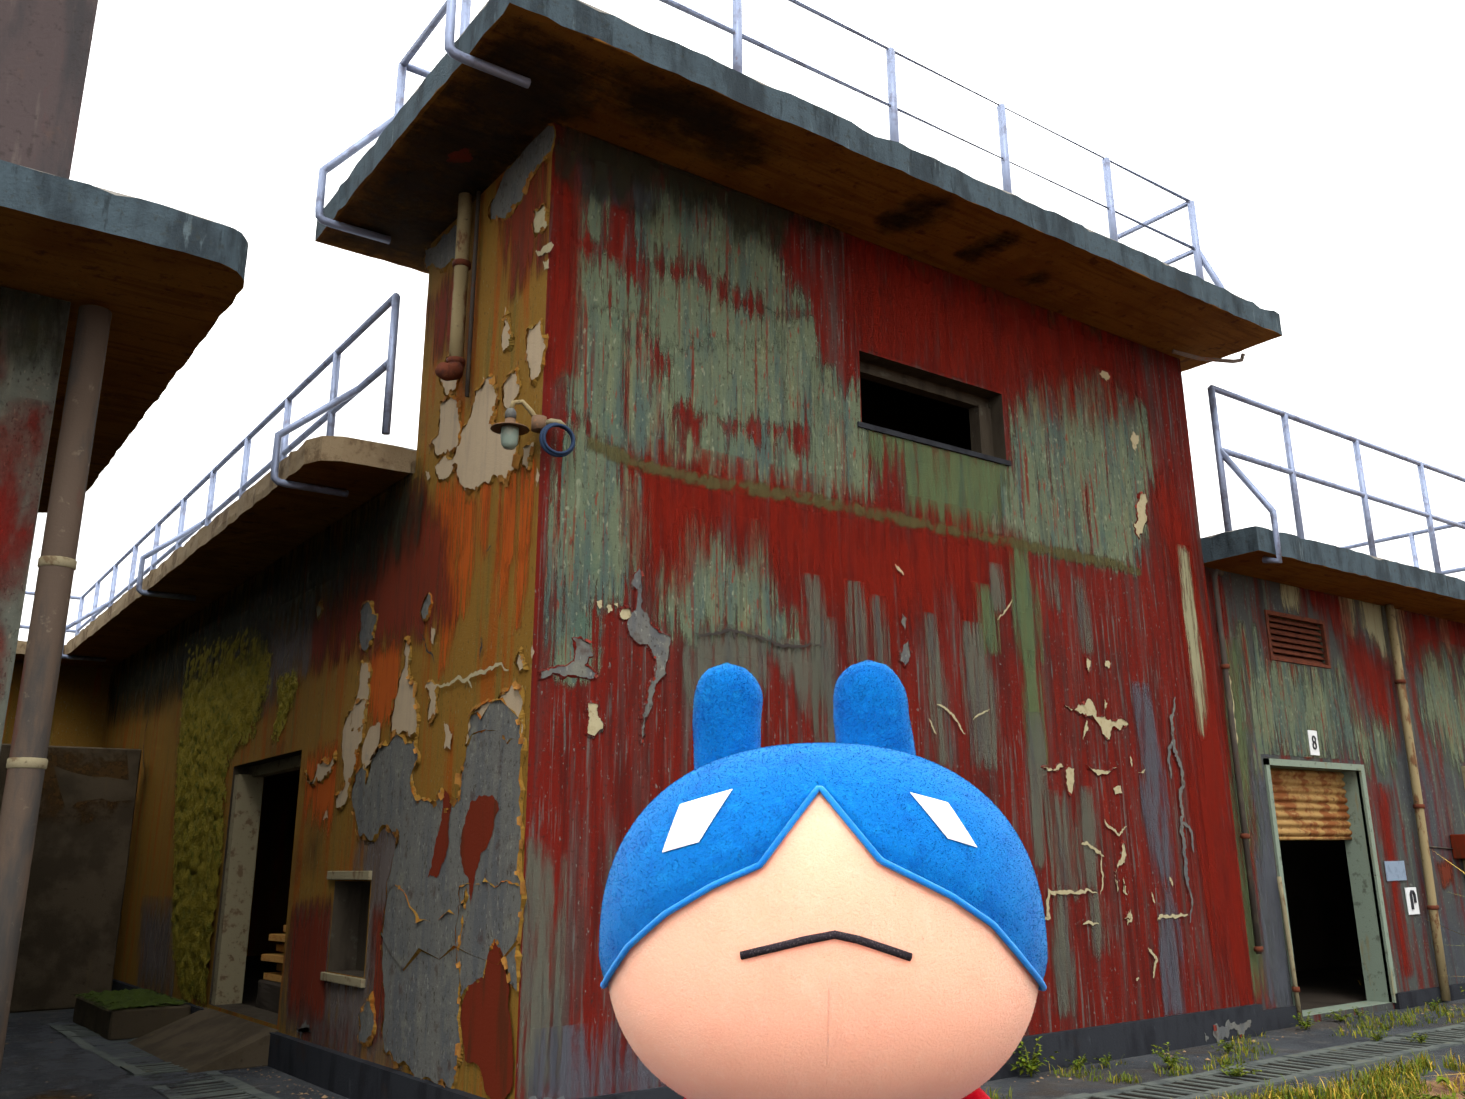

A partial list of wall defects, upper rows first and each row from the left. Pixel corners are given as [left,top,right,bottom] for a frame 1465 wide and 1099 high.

peeling [488,123,556,270]
damp [328,24,1135,420]
rust [305,457,537,729]
peeling [303,176,1155,1089]